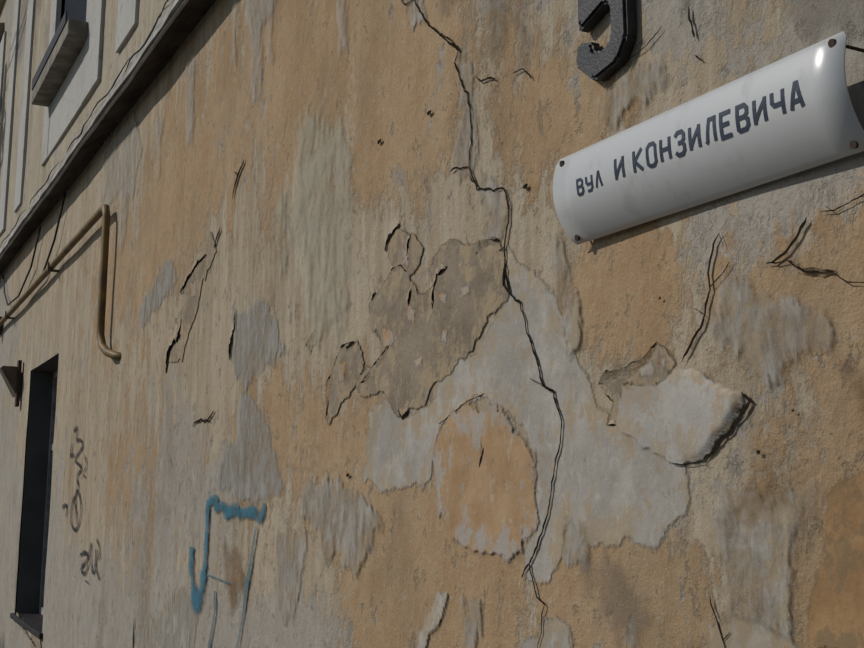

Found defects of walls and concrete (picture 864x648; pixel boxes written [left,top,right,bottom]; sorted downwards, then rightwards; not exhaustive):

crack [232,160,244,199]
crack [401,0,562,648]
flaking render [325,57,690,583]
crack [682,233,729,361]
crack [767,193,864,283]
flaking render [299,475,381,577]
flaking render [706,487,807,648]